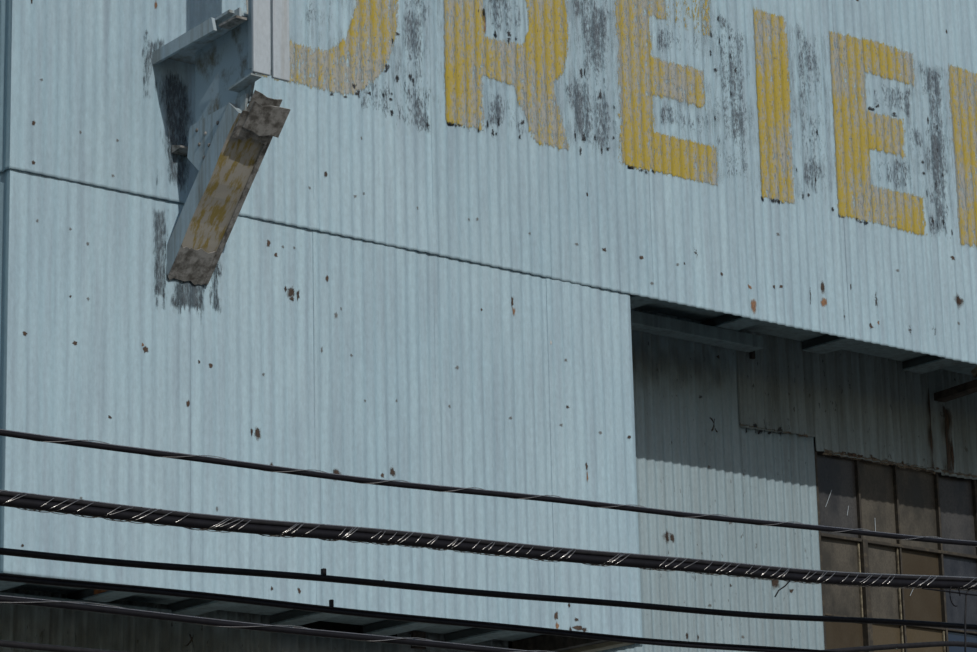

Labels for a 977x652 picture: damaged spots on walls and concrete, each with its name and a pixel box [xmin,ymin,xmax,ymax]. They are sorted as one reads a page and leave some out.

water stain [143,32,190,186]
peeling [330,0,430,129]
peeling [478,96,502,135]
peeling [566,0,615,156]
peeling [661,16,744,142]
peeling [916,69,953,235]
water stain [155,212,221,312]